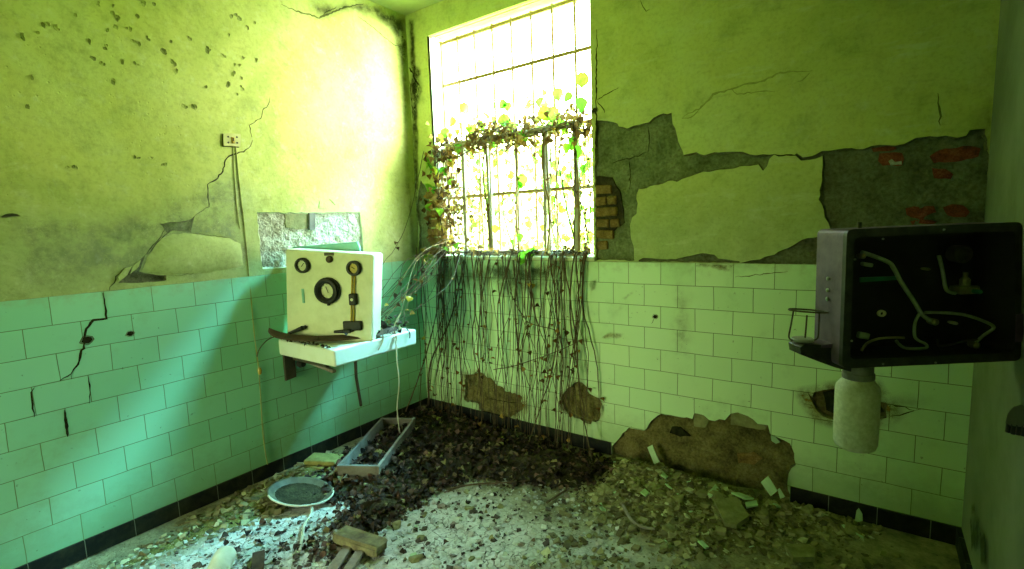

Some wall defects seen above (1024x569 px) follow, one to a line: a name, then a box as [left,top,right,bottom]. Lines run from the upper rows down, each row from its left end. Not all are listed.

crack [282,4,419,117]
leakage [358,6,421,224]
crack [682,70,813,119]
flaking render [591,107,817,264]
flaking render [795,129,989,229]
crack [60,100,270,403]
flaking render [257,199,363,269]
crack [62,410,70,437]
peeling [462,372,526,418]
peeling [561,382,602,424]
peeling [613,412,796,497]
peeling [800,386,835,423]